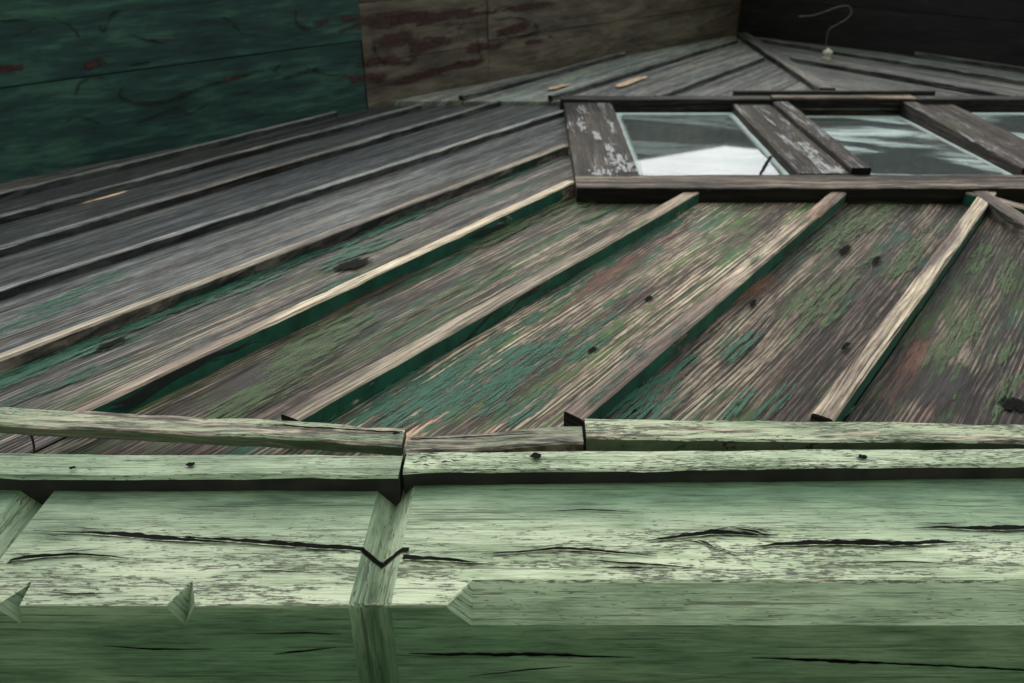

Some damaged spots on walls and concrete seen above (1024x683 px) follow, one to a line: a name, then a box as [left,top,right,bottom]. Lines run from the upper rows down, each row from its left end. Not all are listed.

peeling [577,105,639,175]
peeling [451,196,610,257]
peeling [198,261,512,419]
peeling [325,208,701,435]
peeling [986,341,1024,425]
crack [8,522,1024,579]
crack [760,658,1024,671]